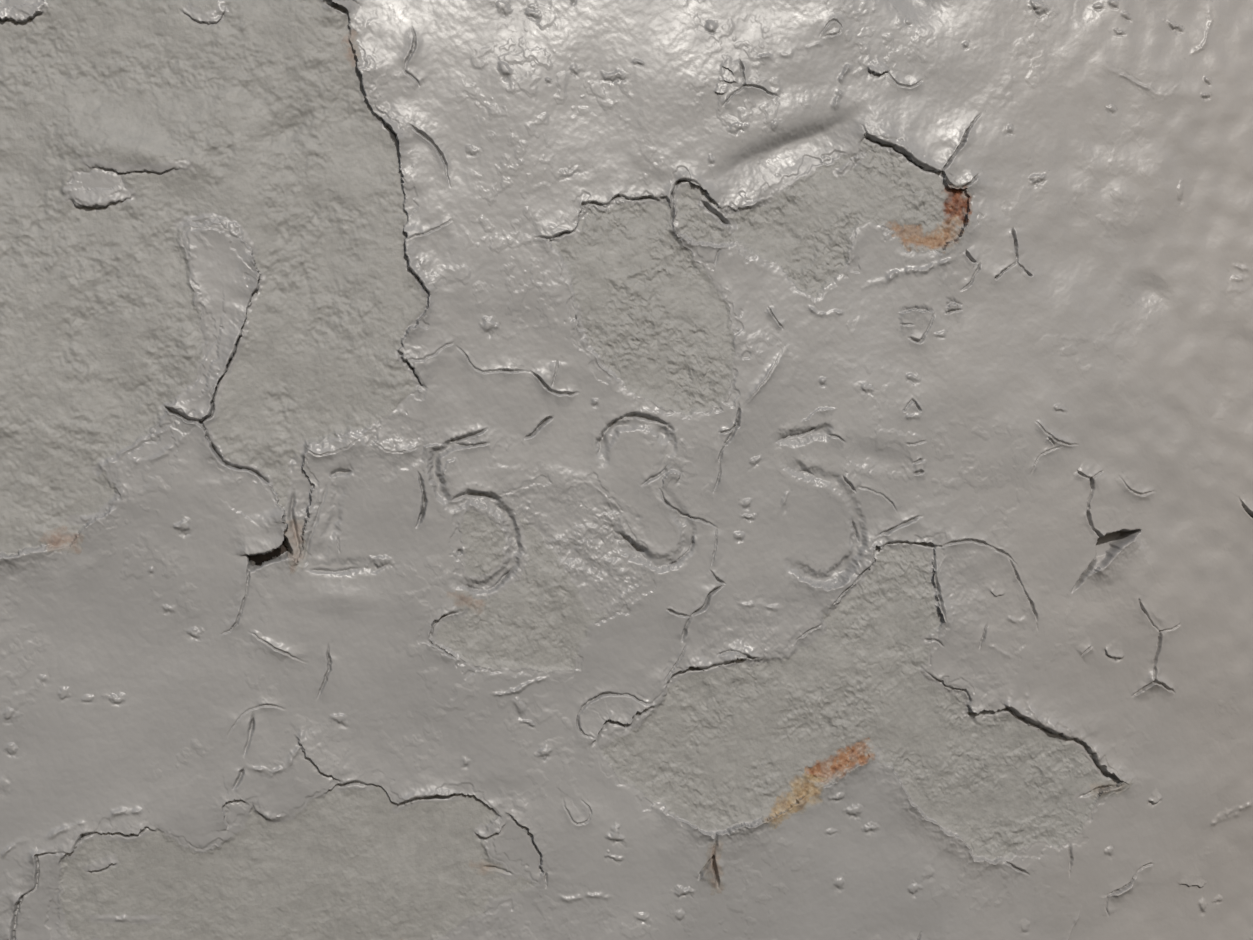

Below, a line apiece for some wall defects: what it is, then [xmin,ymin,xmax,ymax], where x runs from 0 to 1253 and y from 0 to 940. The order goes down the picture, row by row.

peeling [0,0,452,572]
peeling [530,109,986,415]
rust [885,182,974,254]
crack [955,223,1038,298]
crack [636,301,788,687]
crack [838,470,929,544]
crack [1026,417,1185,702]
crack [1234,492,1253,522]
peeling [0,699,629,940]
rust [761,736,876,830]
peeling [572,535,1133,883]